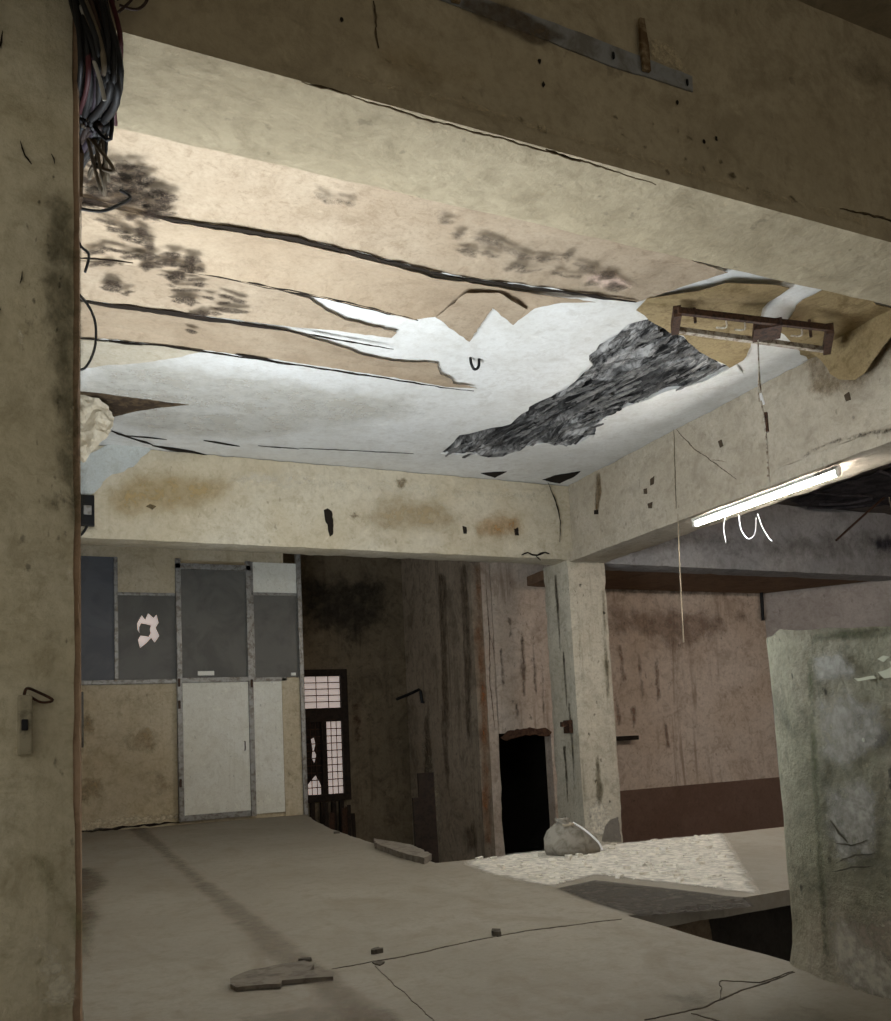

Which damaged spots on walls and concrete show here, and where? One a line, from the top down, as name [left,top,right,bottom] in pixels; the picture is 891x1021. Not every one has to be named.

crack [301,81,656,185]
damp [47,154,248,437]
crack [207,275,418,321]
crack [81,197,637,303]
peeling [80,128,789,458]
peeling [781,290,891,380]
crack [840,208,891,222]
peeling [80,391,188,495]
spalling [543,471,580,484]
damp [816,629,887,640]
damp [811,730,891,999]